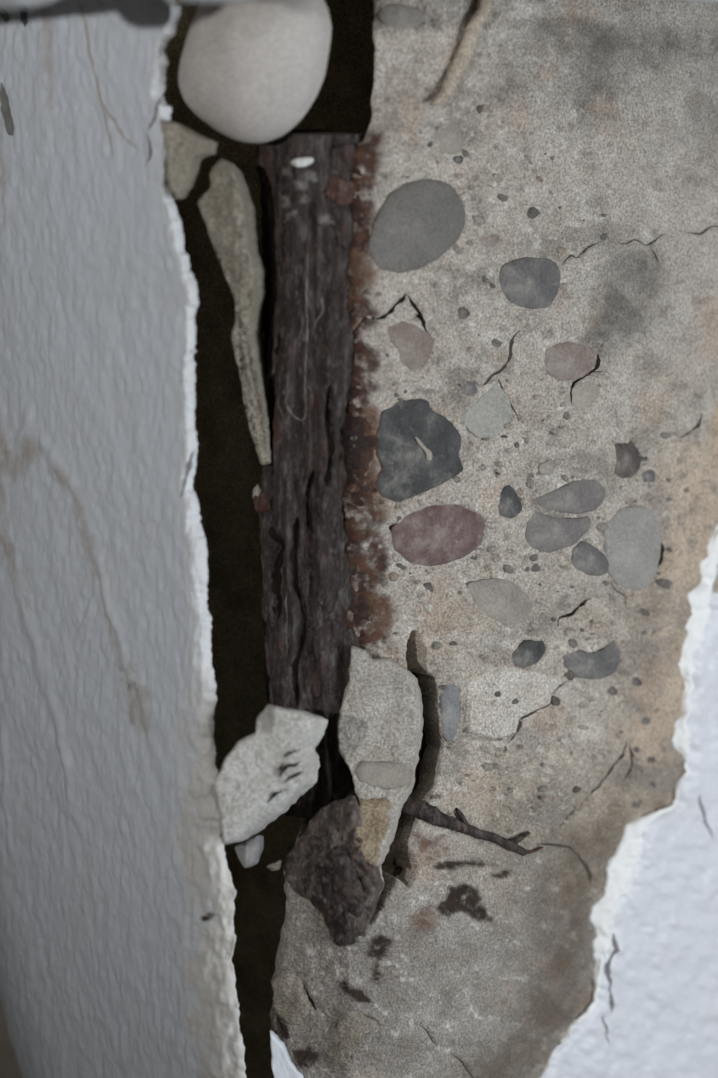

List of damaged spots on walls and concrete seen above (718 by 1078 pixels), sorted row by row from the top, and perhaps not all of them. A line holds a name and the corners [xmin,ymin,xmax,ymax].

crack [563,226,718,266]
rust [305,134,392,697]
spalling [144,0,718,1078]
crack [509,683,564,742]
crack [537,740,633,883]